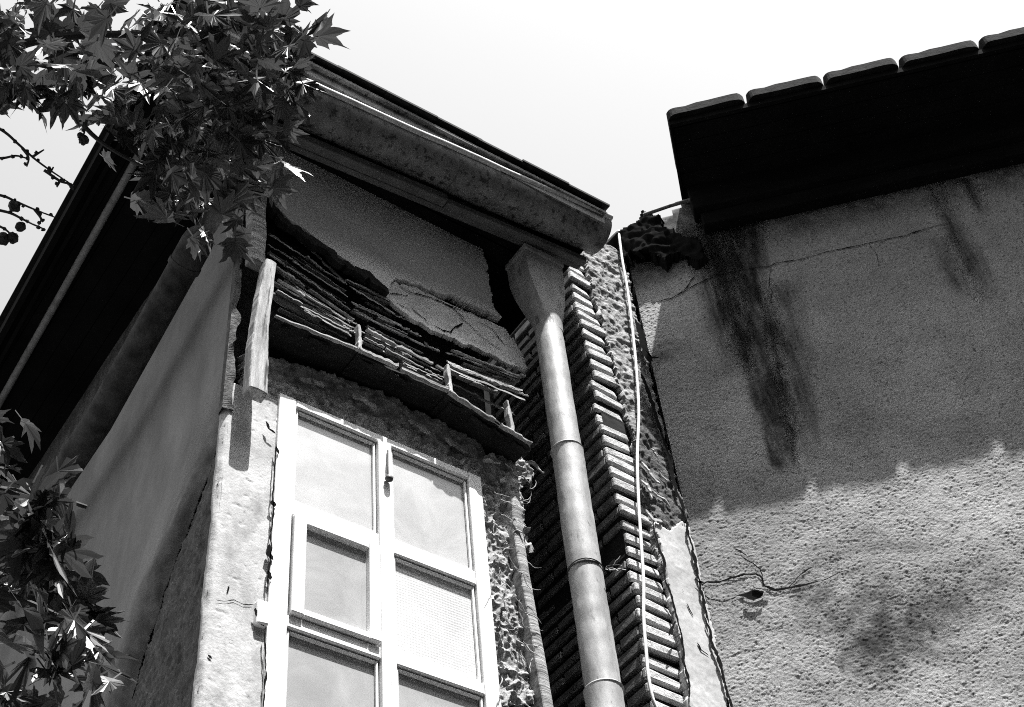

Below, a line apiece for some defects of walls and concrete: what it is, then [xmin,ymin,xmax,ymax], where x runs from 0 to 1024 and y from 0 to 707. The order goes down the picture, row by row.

flaking render [266,197,389,297]
water stain [702,223,803,466]
crack [635,222,951,707]